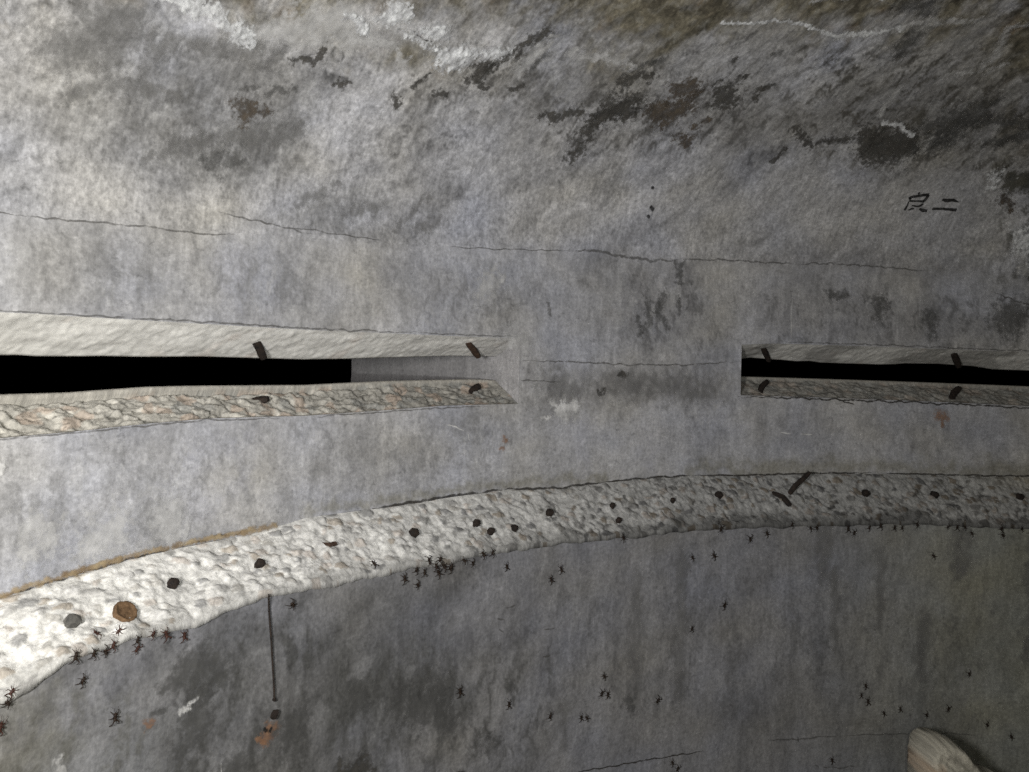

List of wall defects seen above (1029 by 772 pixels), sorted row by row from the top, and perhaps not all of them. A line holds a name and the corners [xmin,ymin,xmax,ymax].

leakage [161,0,559,92]
leakage [720,0,980,56]
leakage [229,87,289,129]
leakage [539,46,775,164]
leakage [769,90,1029,167]
crack [580,751,700,772]